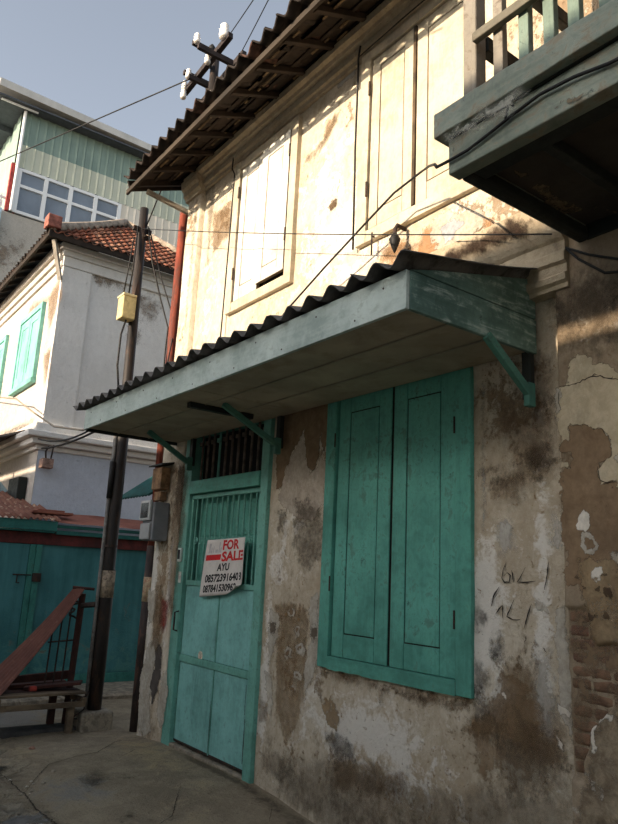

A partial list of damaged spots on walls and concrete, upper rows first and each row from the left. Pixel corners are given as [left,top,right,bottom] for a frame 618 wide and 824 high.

leakage [444,219,527,259]
crack [557,374,618,411]
flaking render [276,404,328,489]
flaking render [554,353,618,600]
peeling [147,588,159,625]
peeling [138,638,168,737]
flaking render [264,593,319,742]
leakage [322,697,353,785]
flaking render [535,600,618,801]